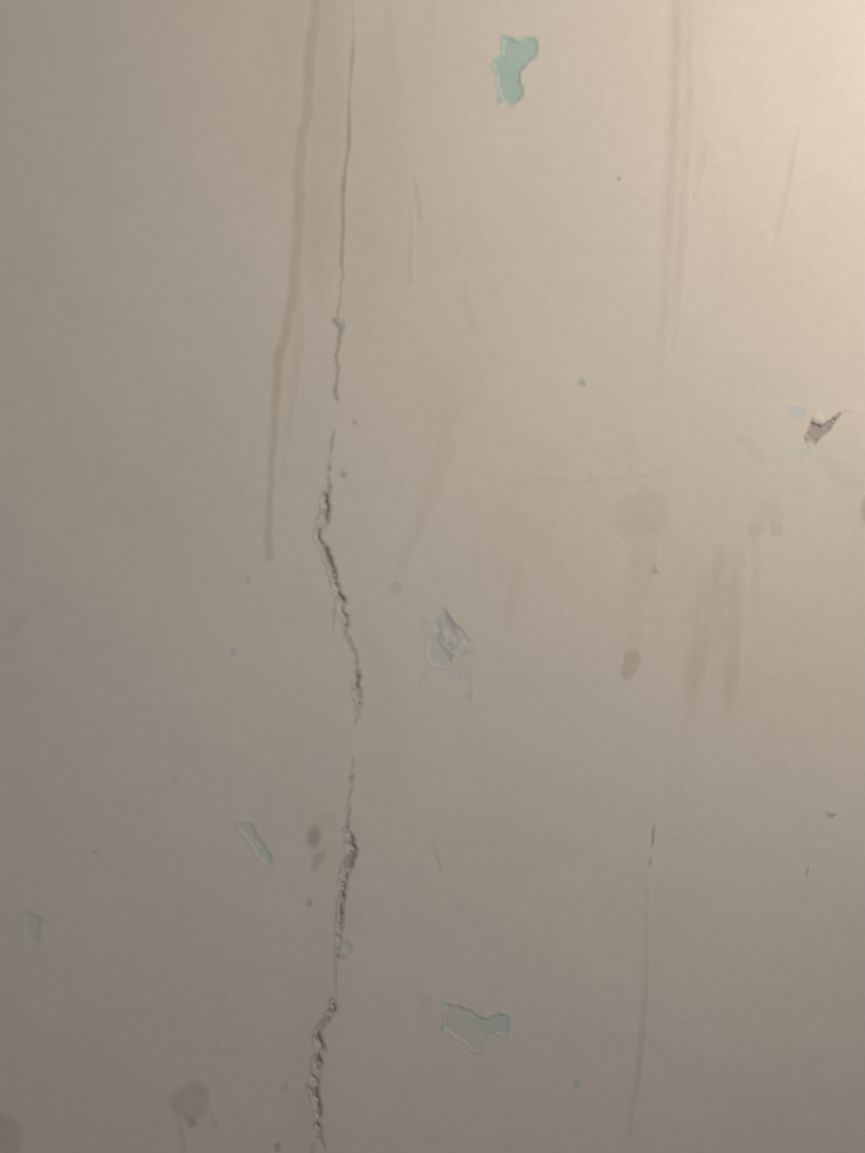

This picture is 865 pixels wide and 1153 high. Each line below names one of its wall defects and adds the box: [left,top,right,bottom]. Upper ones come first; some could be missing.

peeling [489,32,541,113]
leakage [262,0,322,563]
crack [312,0,366,726]
spalling [782,403,865,458]
crack [303,754,361,1153]